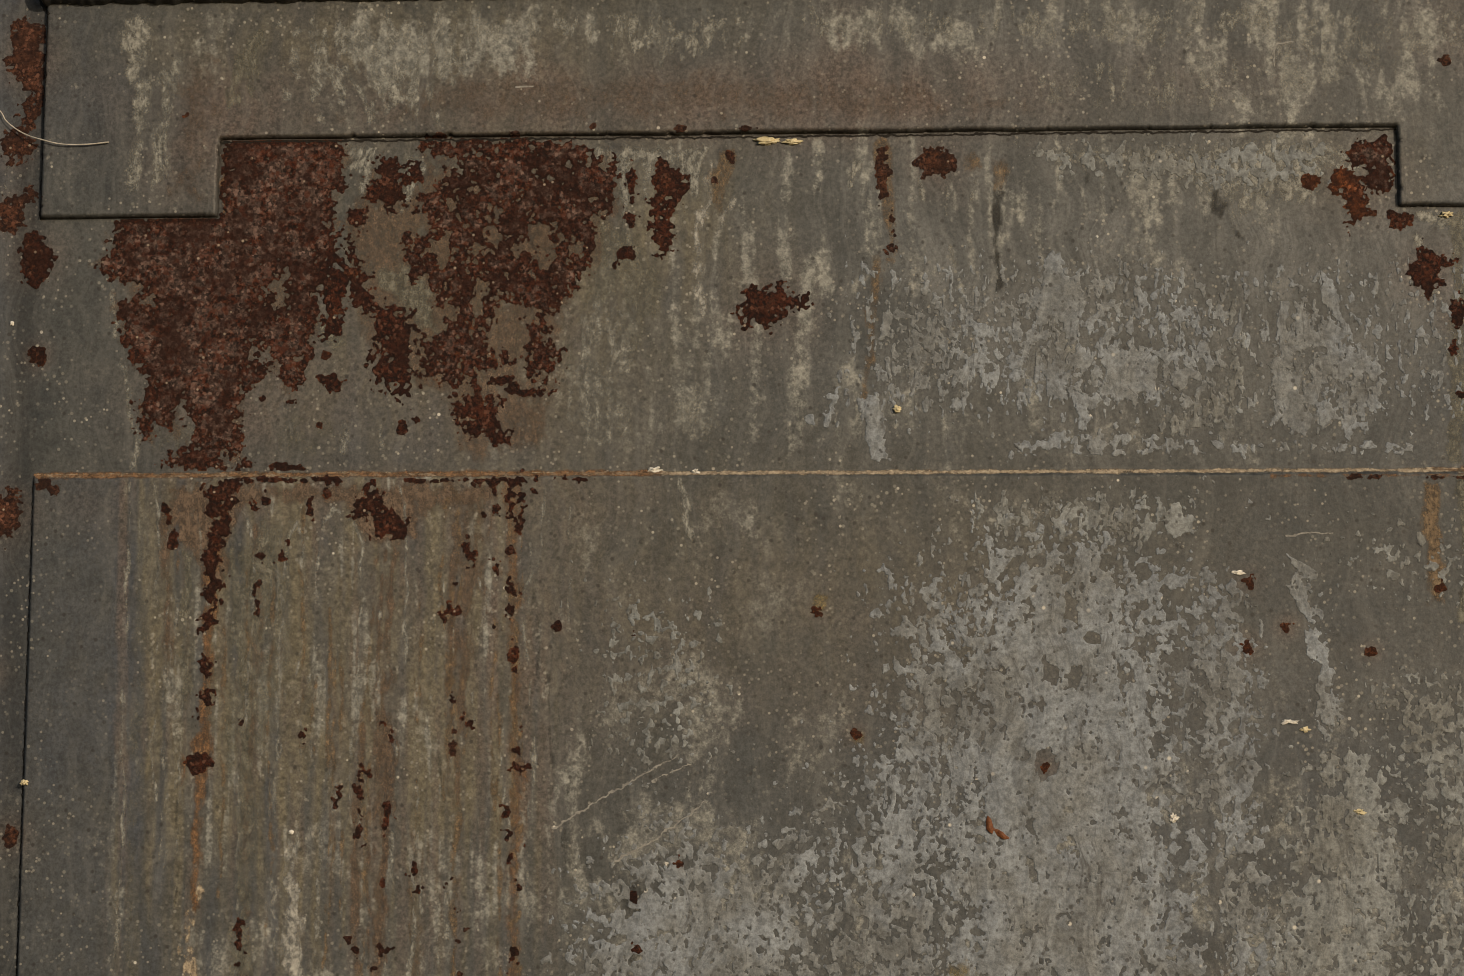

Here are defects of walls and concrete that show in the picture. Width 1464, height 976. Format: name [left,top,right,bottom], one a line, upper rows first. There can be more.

corrosion [0,15,46,167]
corrosion [730,280,814,338]
corrosion [873,138,898,301]
corrosion [912,146,1007,189]
corrosion [1301,134,1464,356]
corrosion [0,122,691,912]
corrosion [298,608,397,976]
corrosion [232,911,249,976]
corrosion [499,928,520,976]